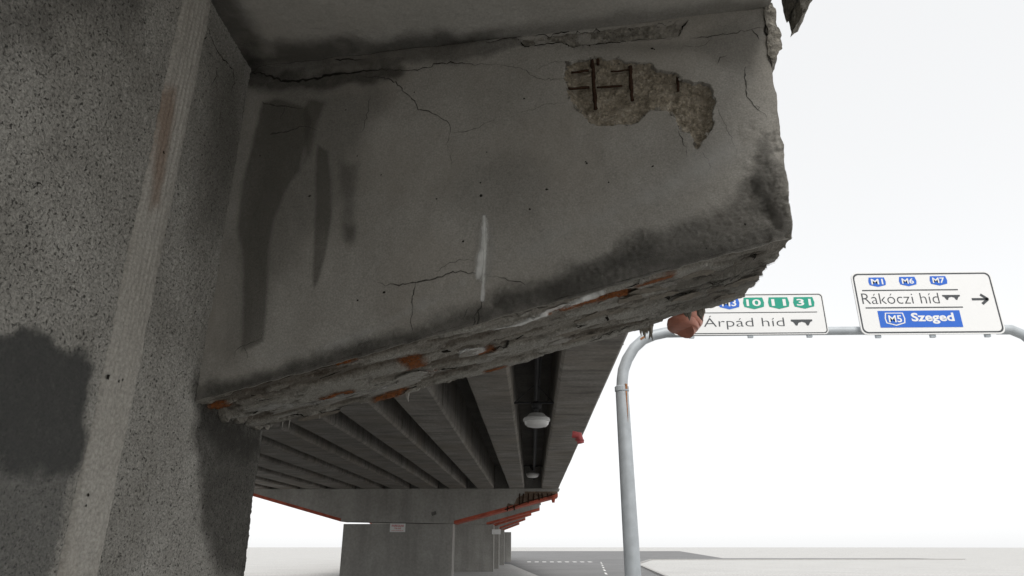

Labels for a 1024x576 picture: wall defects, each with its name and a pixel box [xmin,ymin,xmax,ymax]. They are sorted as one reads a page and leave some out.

crack [358,61,565,161]
spalling [485,21,717,149]
water stain [476,216,486,301]
water stain [0,331,90,473]
flaking render [346,371,430,399]
corrosion [400,354,437,377]
crack [375,243,758,395]